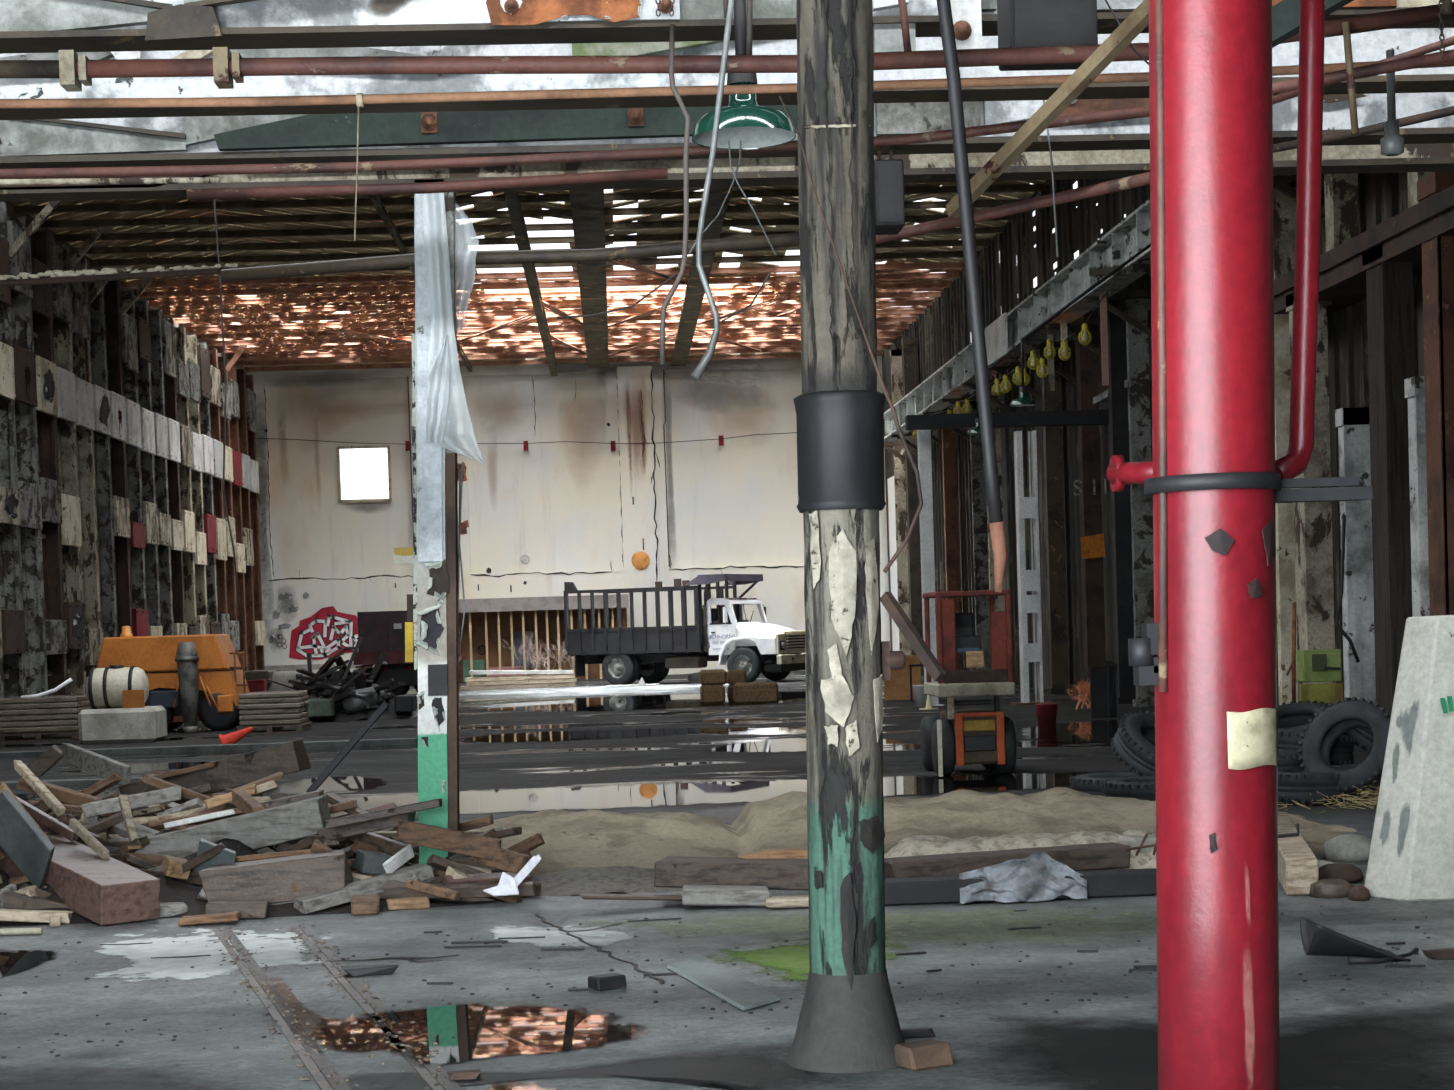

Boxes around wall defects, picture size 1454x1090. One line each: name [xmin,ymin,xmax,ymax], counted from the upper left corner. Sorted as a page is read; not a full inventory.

rust [486,0,643,26]
peeling [43,369,55,403]
peeling [99,393,111,428]
peeling [4,493,19,519]
peeling [809,510,883,756]
peeling [859,815,885,854]
peeling [814,870,878,990]